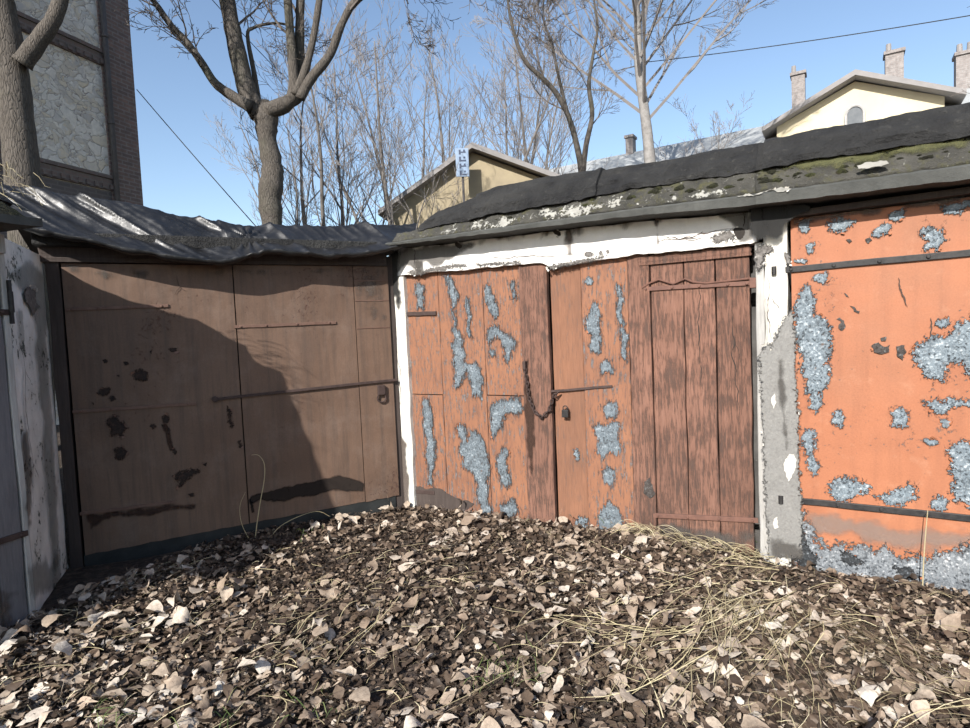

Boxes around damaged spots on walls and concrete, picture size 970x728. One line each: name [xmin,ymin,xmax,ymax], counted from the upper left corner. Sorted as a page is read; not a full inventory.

spalling [710,226,745,245]
spalling [753,217,816,272]
peeling [865,207,906,243]
peeling [917,200,970,252]
peeling [584,281,630,377]
peeling [406,260,524,518]
rust [106,414,129,461]
rust [150,412,177,455]
peeling [575,399,626,530]
peeling [756,271,970,594]
rust [86,462,207,527]
rust [249,475,364,513]